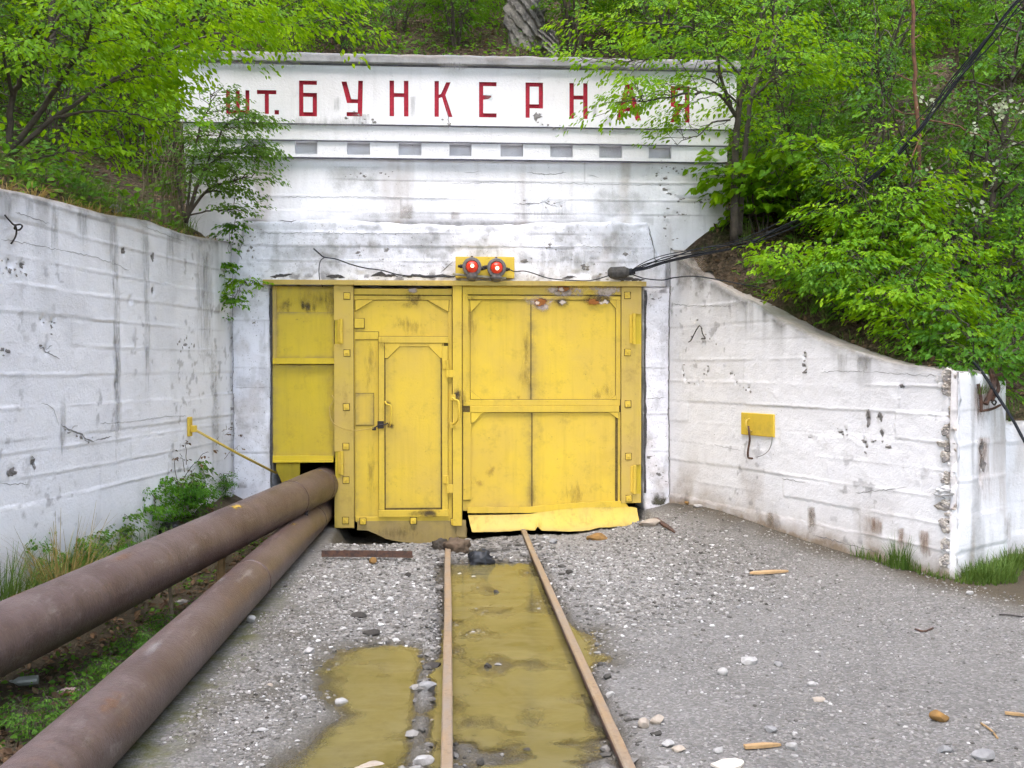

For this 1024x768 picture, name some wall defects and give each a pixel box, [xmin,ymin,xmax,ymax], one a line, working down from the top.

spalling [562,259,667,493]
peeling [861,409,891,454]
spalling [933,367,958,567]